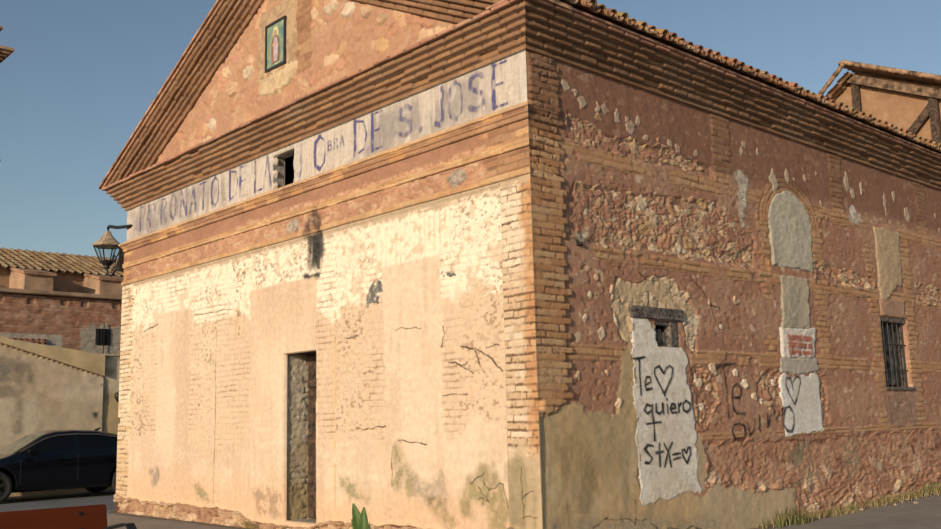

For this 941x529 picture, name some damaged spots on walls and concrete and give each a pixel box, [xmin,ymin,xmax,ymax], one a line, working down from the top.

spalling [566,179,754,269]
spalling [366,280,383,308]
peeling [478,269,504,301]
spalling [914,282,941,307]
spalling [598,275,699,352]
spalling [689,363,941,517]
crack [593,501,701,529]